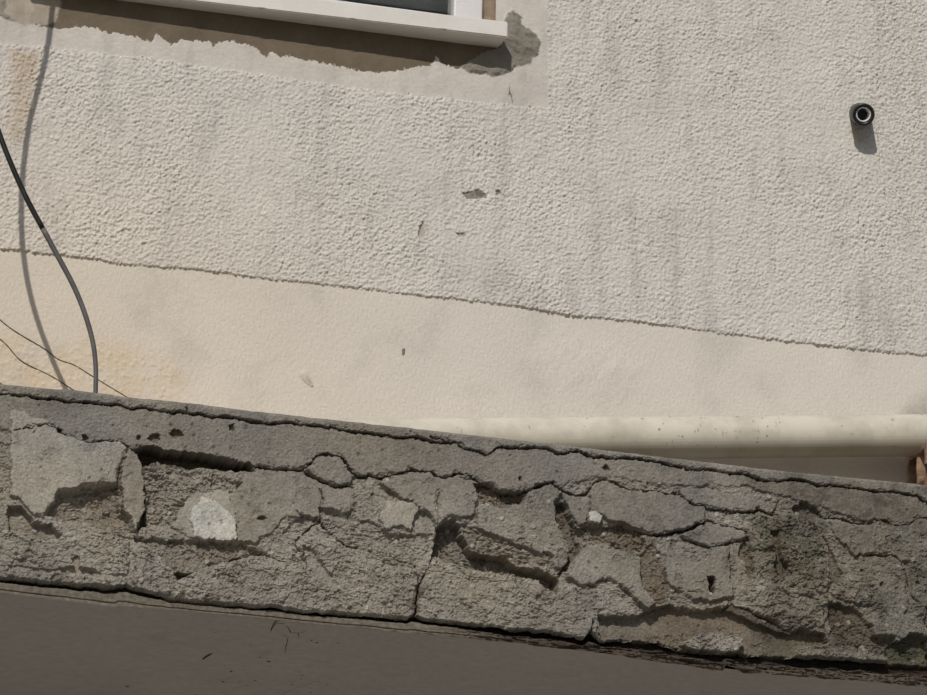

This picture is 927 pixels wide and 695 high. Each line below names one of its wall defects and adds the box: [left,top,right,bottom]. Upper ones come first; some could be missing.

spalling [8,485,265,580]
peeling [135,445,254,488]
crack [0,392,927,651]
spalling [286,473,927,670]